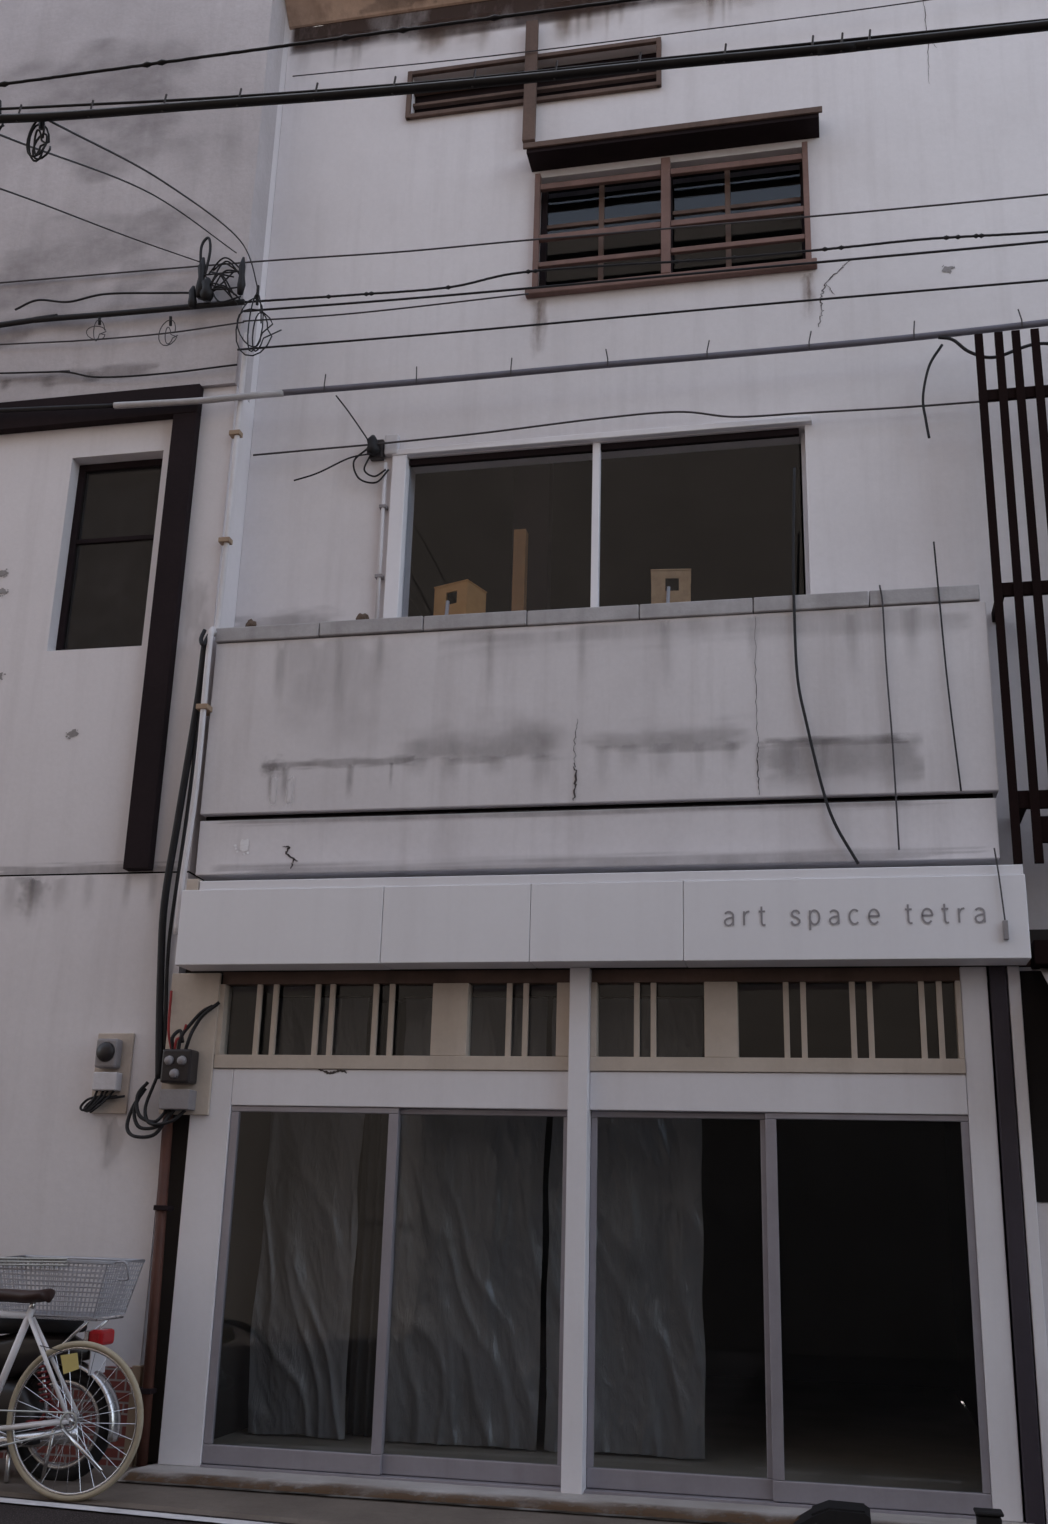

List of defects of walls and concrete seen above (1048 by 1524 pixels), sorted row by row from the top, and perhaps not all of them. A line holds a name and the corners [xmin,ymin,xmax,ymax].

crack [571,719,579,799]
crack [284,846,298,869]